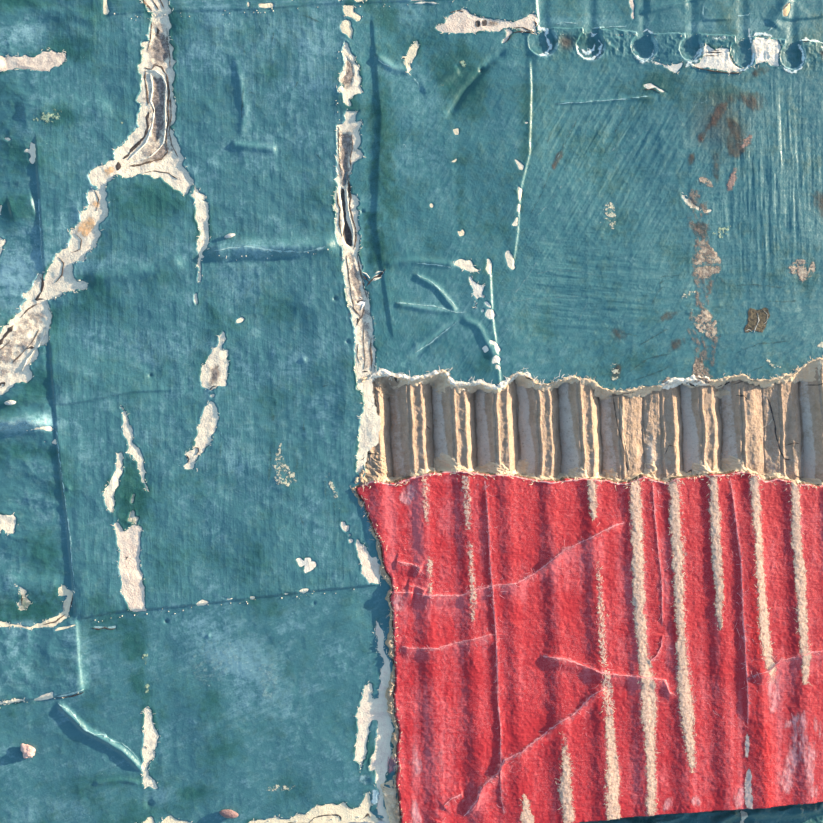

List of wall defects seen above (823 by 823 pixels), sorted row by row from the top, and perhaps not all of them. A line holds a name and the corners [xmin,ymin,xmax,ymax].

peeling [339,0,367,38]
peeling [436,7,538,43]
peeling [0,49,66,72]
peeling [693,35,781,76]
peeling [24,142,36,164]
peeling [184,332,229,471]
peeling [103,407,149,512]
peeling [112,494,147,612]
peeling [0,585,75,631]
peeling [140,706,159,789]
peeling [250,792,378,823]